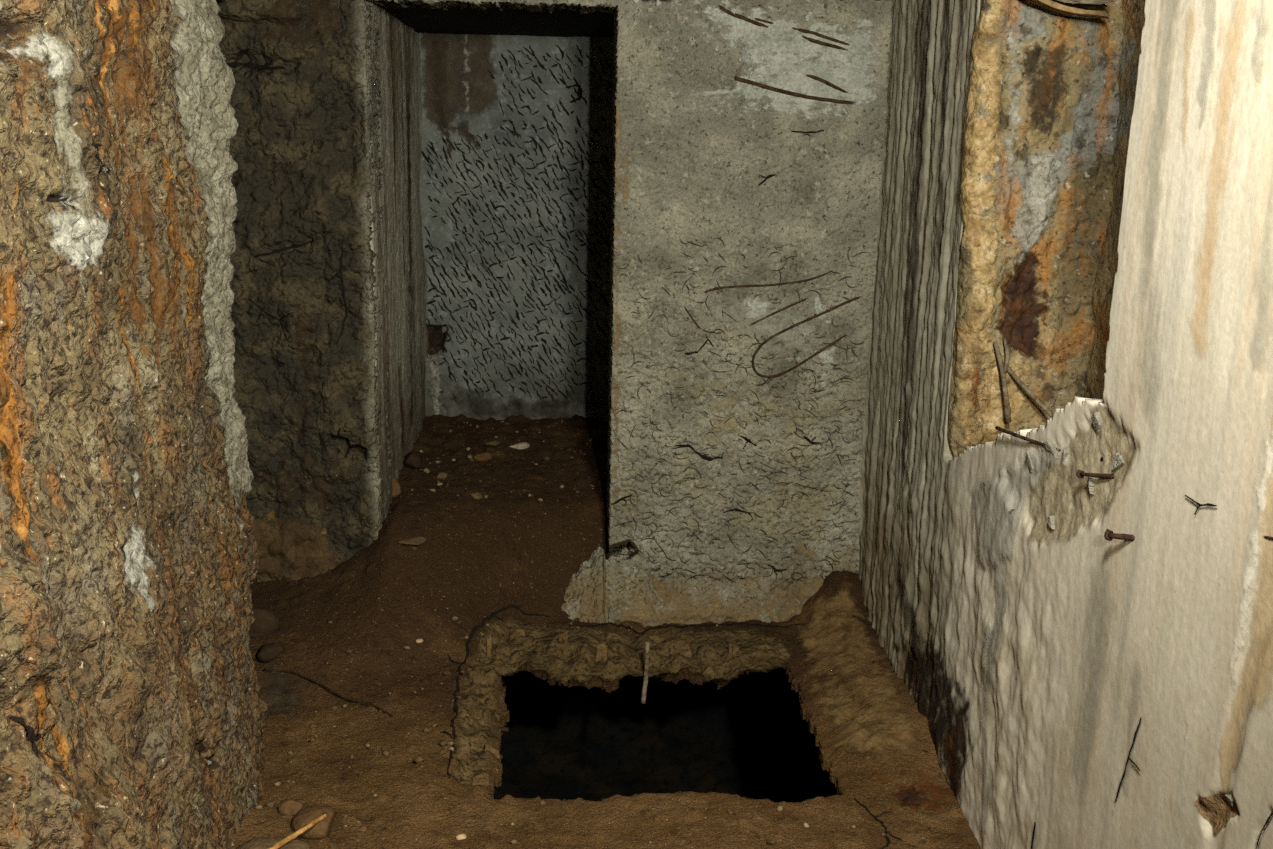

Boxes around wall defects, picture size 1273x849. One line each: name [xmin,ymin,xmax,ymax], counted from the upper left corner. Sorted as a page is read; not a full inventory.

rust [996,252,1048,363]
crack [611,236,869,584]
spalling [1028,405,1136,545]